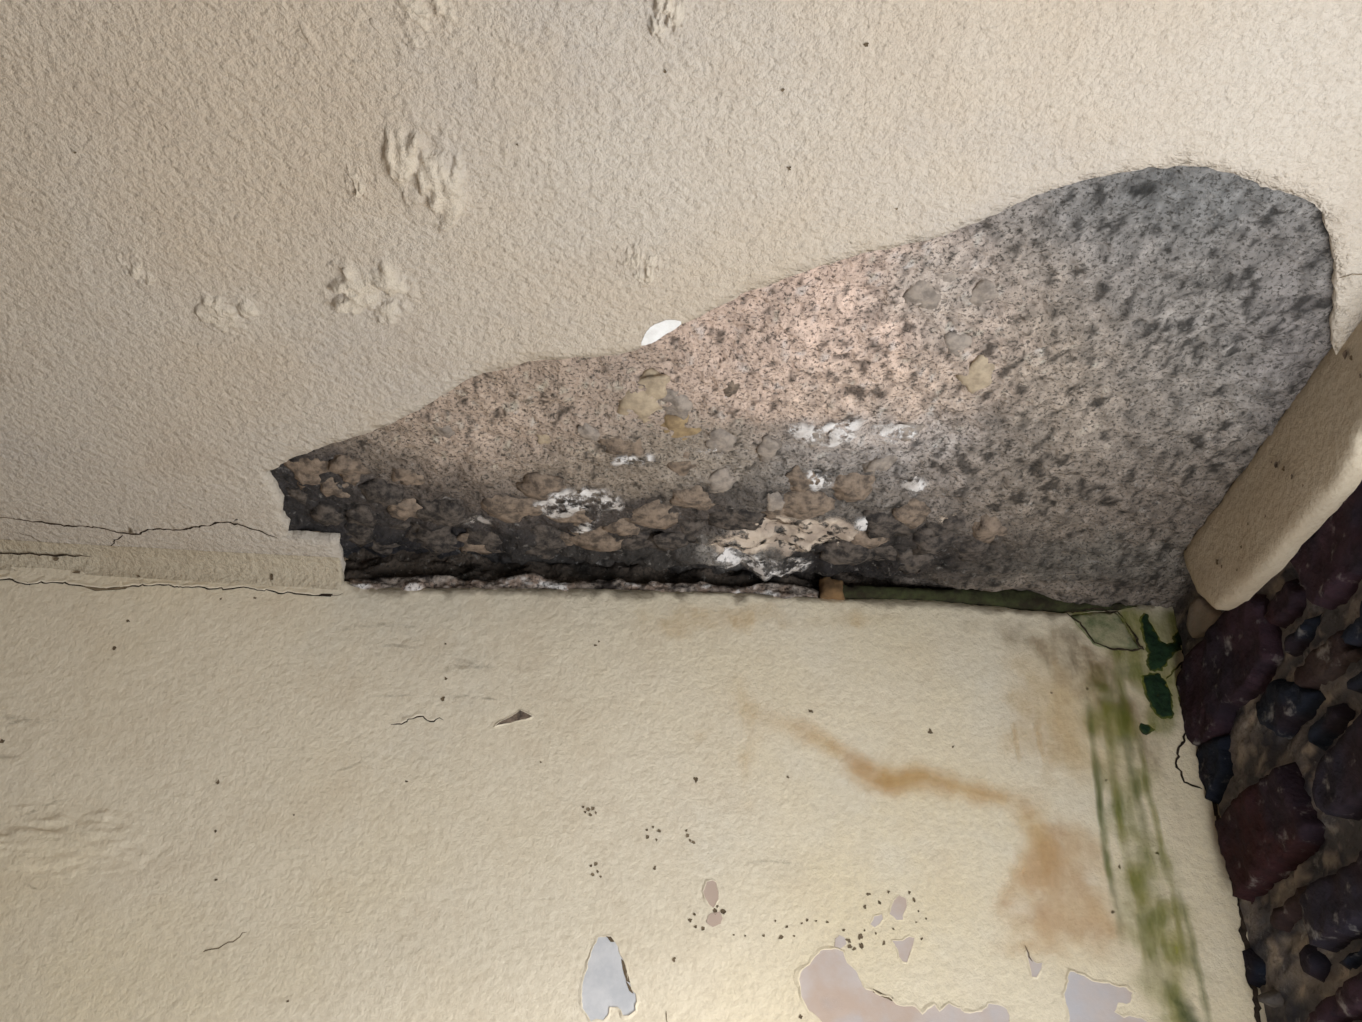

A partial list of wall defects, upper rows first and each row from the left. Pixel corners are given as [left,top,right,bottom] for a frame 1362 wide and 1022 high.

spalling [270,166,1334,649]
crack [0,514,343,597]
peeling [688,879,726,931]
peeling [578,933,641,1022]
peeling [762,891,1012,1022]
peeling [1061,968,1149,1022]